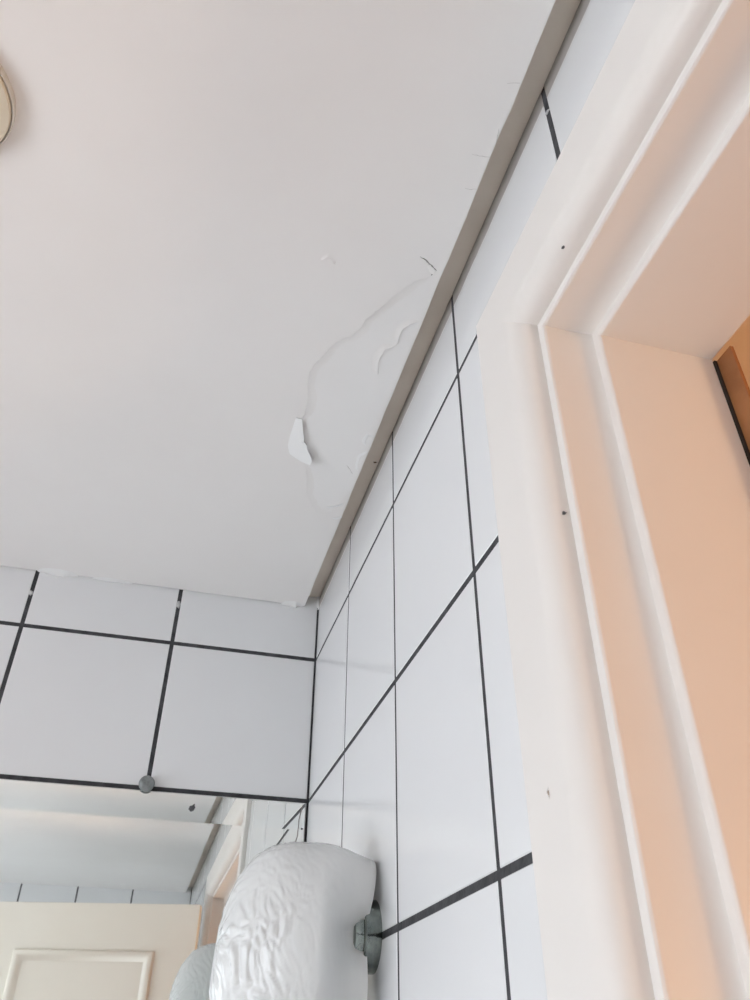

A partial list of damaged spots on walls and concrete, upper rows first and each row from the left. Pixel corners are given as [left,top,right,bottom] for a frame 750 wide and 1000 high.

peeling [288,275,434,520]